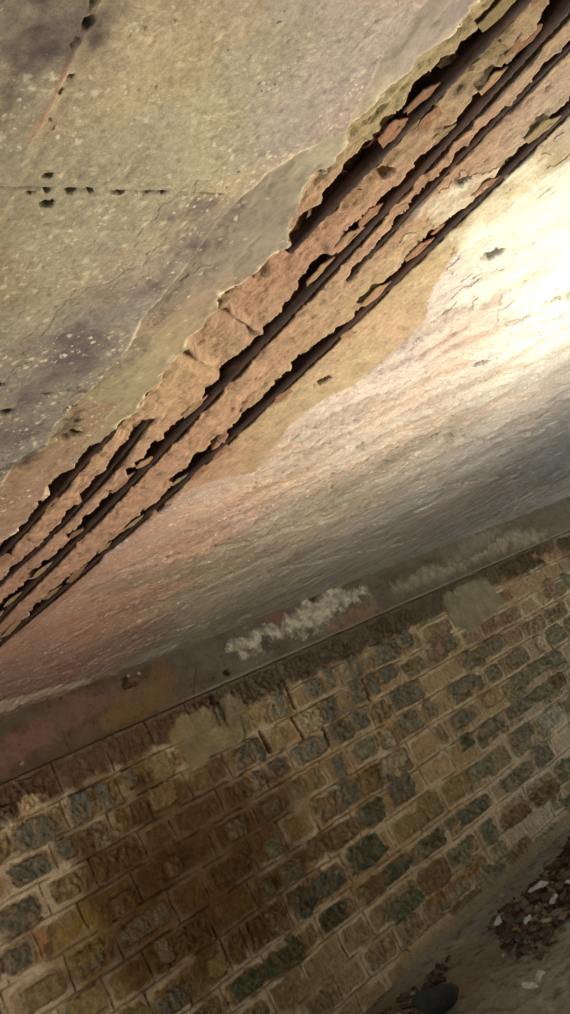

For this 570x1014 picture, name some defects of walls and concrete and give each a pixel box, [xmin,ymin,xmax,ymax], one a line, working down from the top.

crack [0,74,225,196]
spalling [0,0,570,652]
damp [386,522,550,599]
damp [218,583,376,668]
damp [0,672,100,714]
damp [207,692,252,753]
damp [0,791,50,841]
damp [109,827,206,915]
damp [37,901,116,991]